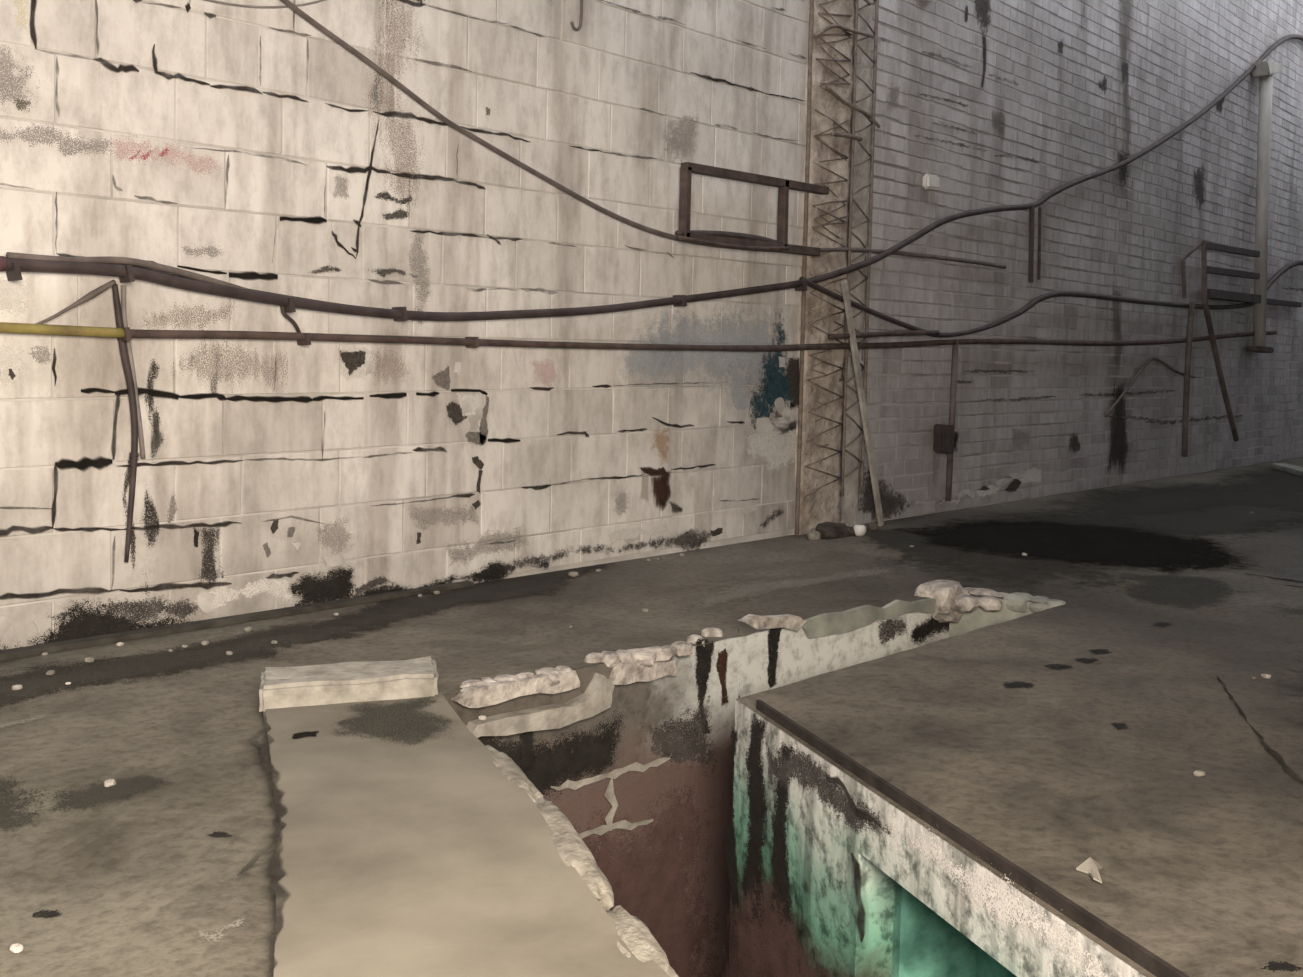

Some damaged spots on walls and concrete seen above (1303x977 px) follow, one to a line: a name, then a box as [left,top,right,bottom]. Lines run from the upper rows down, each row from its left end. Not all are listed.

leakage [964,0,992,87]
crack [30,0,544,284]
leakage [362,0,434,324]
crack [411,230,576,247]
leakage [0,339,294,650]
crack [0,462,324,600]
crack [52,348,488,467]
crack [374,493,475,506]
corrosion [640,428,684,514]
leakage [610,287,794,434]
leakage [478,638,851,977]
spalling [443,596,1189,977]